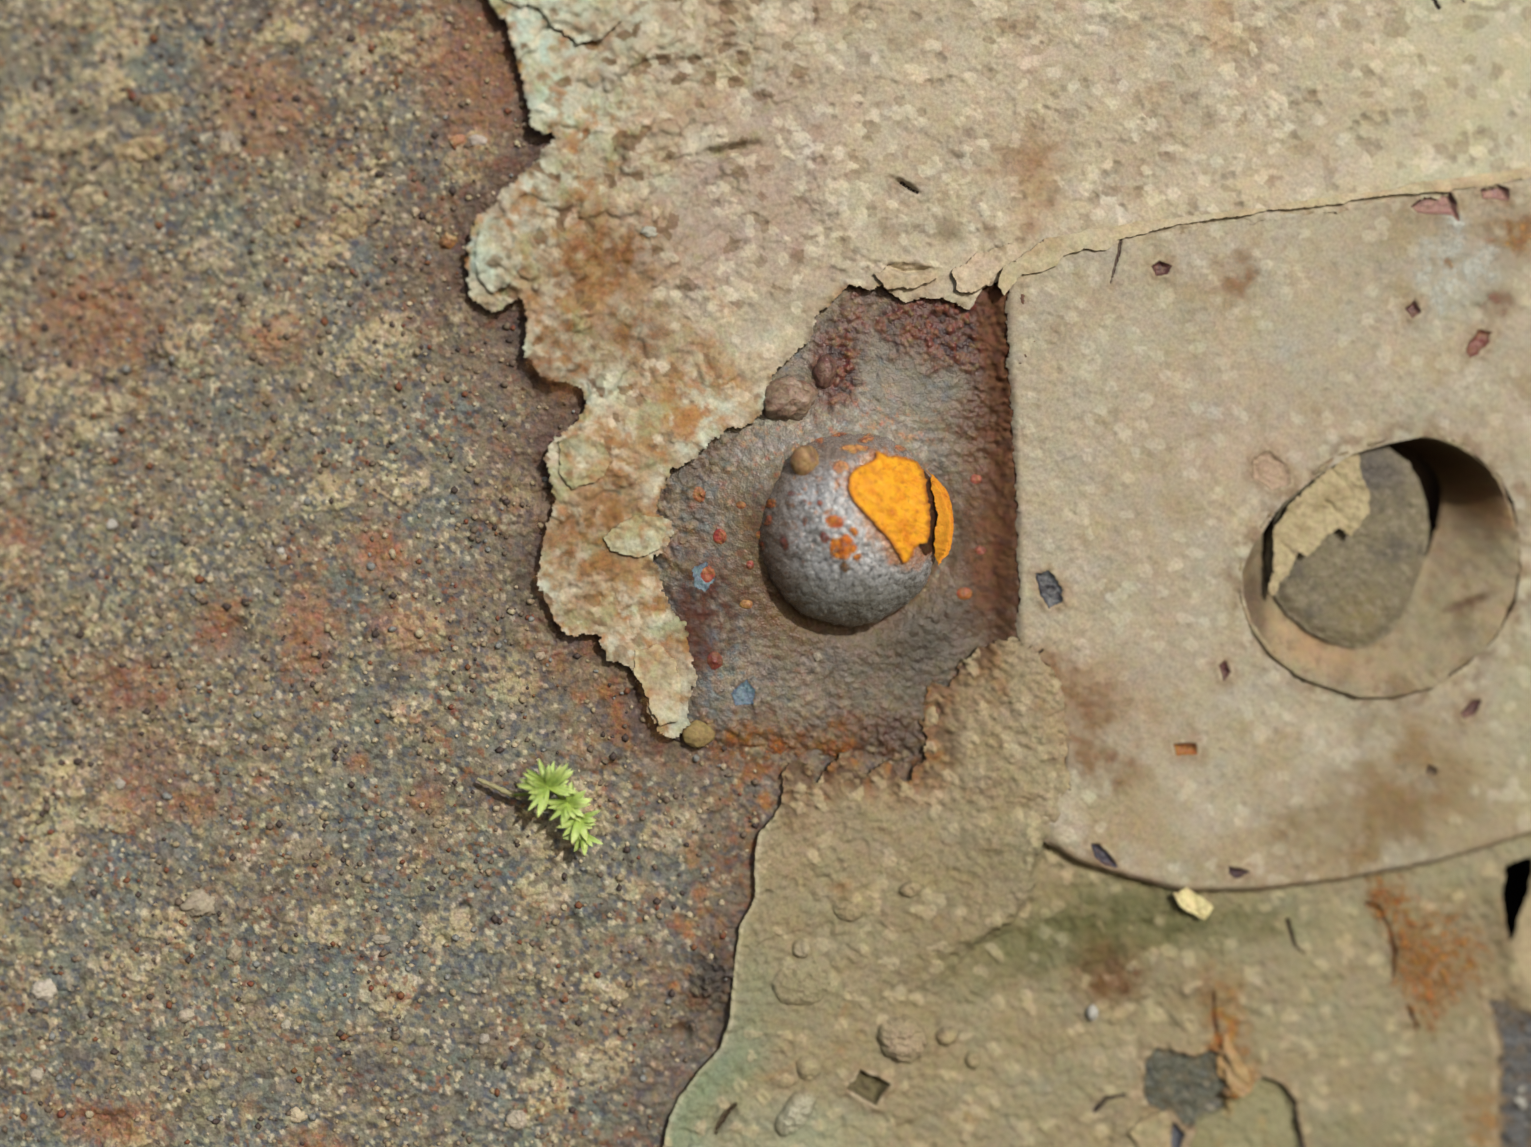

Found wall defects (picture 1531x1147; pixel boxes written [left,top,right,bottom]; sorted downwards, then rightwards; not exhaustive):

rust [565,231,641,289]
crack [1110,239,1123,284]
rust [763,354,837,421]
rust [816,432,874,473]
rust [956,285,1018,610]
rust [549,521,615,582]
rust [746,491,794,570]
rust [803,500,861,572]
rust [895,445,938,556]
peeling [464,0,1531,1147]
rust [680,561,753,670]
rust [1369,877,1482,1029]